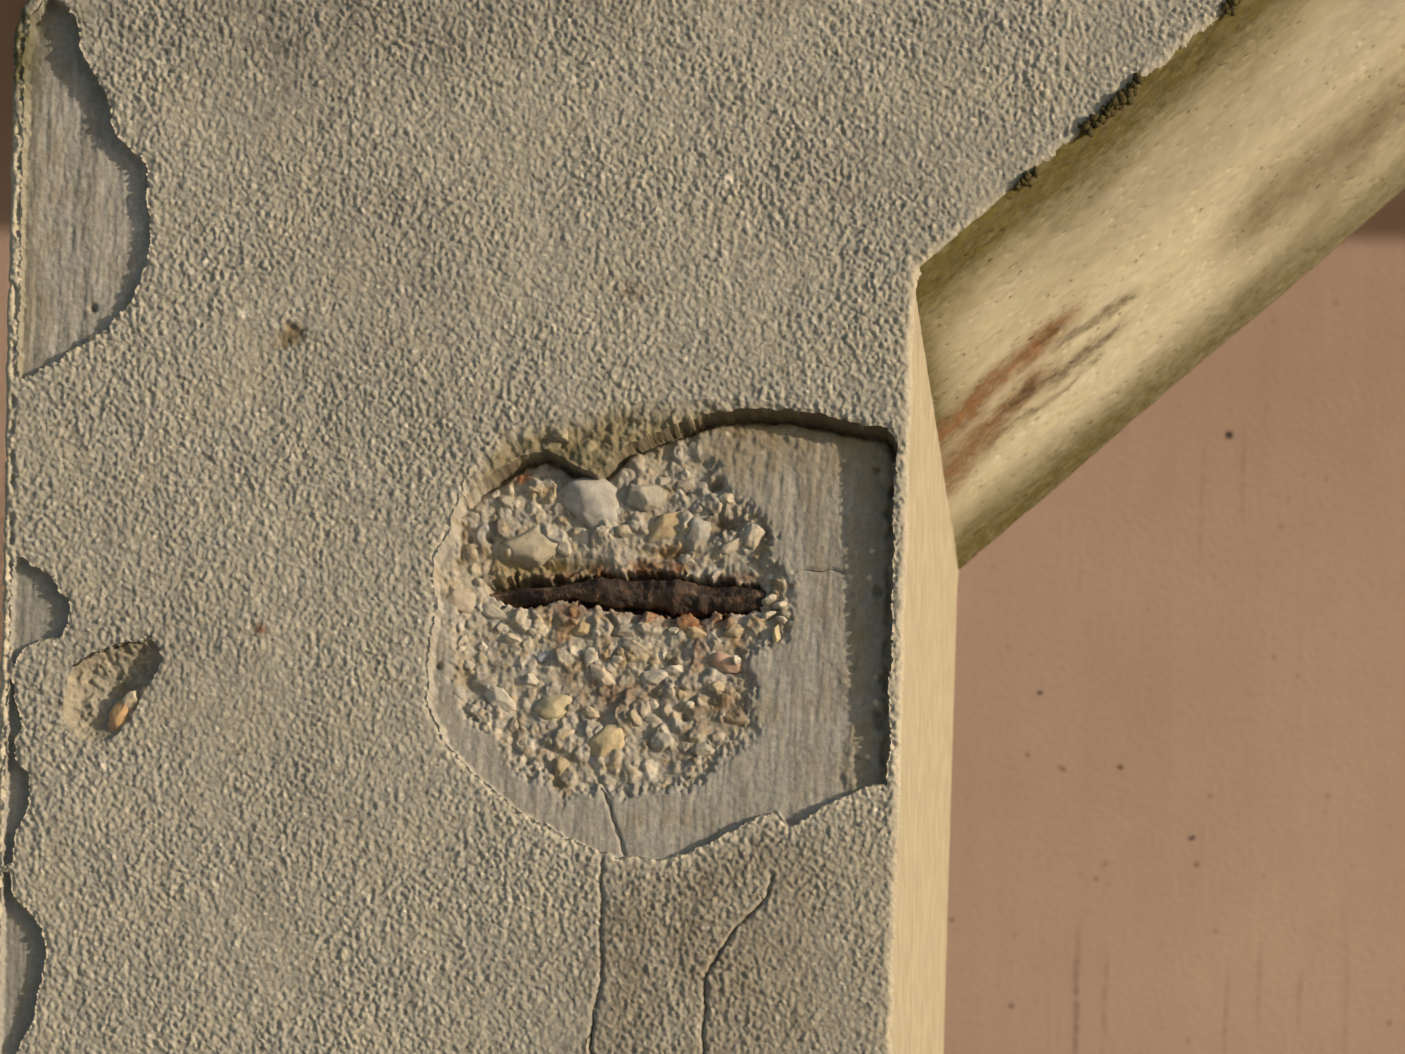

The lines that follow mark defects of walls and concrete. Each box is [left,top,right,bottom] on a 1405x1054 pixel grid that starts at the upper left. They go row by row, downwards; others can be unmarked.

flaking render [16,0,151,379]
rust [938,315,1071,491]
flaking render [0,557,70,1054]
spalling [61,639,162,744]
crack [585,789,625,1054]
spalling [427,397,898,859]
rust [640,611,720,626]
crack [702,882,771,1054]